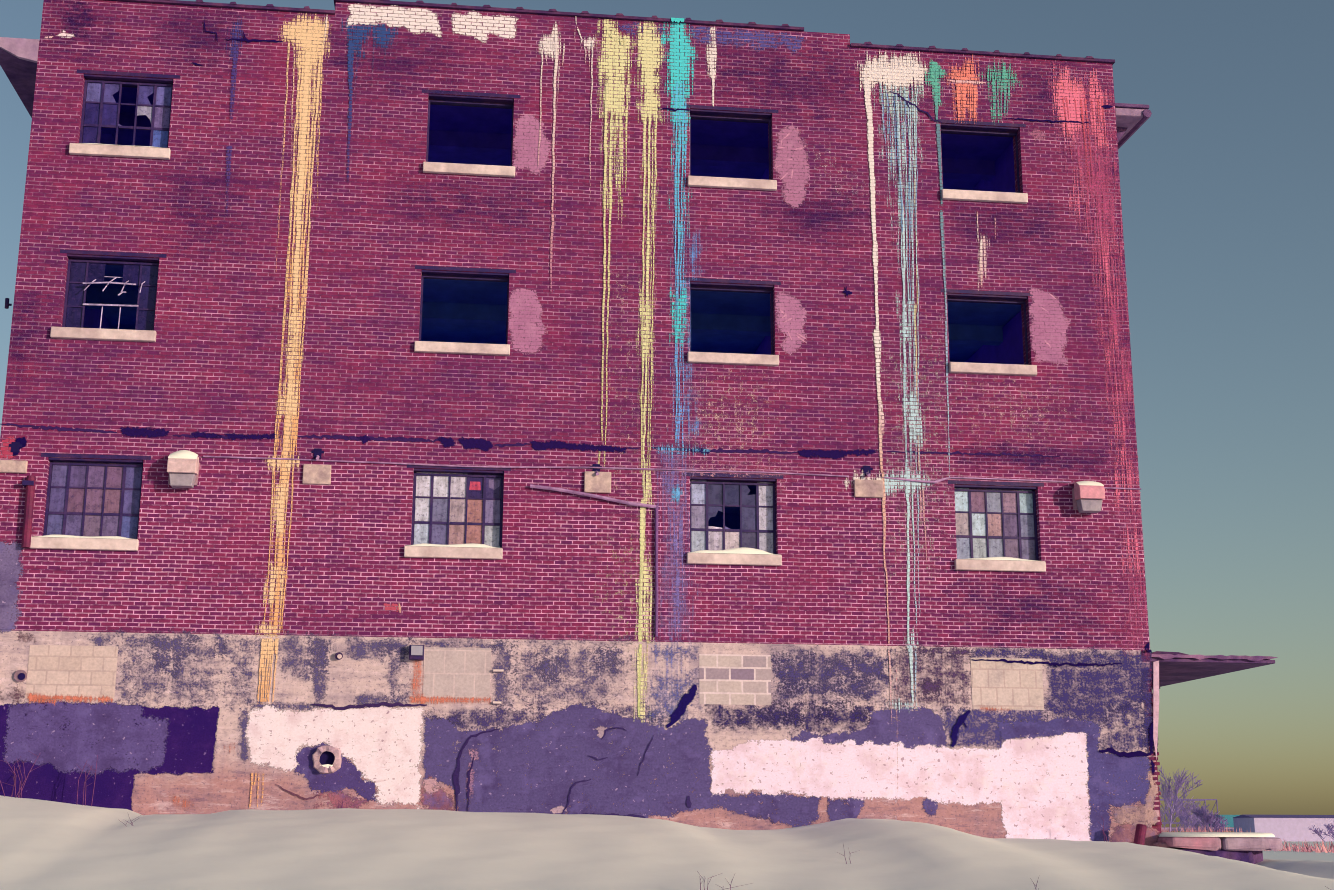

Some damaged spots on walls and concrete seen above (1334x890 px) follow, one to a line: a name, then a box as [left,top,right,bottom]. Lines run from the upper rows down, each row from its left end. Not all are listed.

water stain [89,15,1154,808]
crack [971,659,1122,668]
crack [452,729,499,812]
crack [562,684,697,818]
crack [951,709,971,747]
crack [1099,747,1151,758]